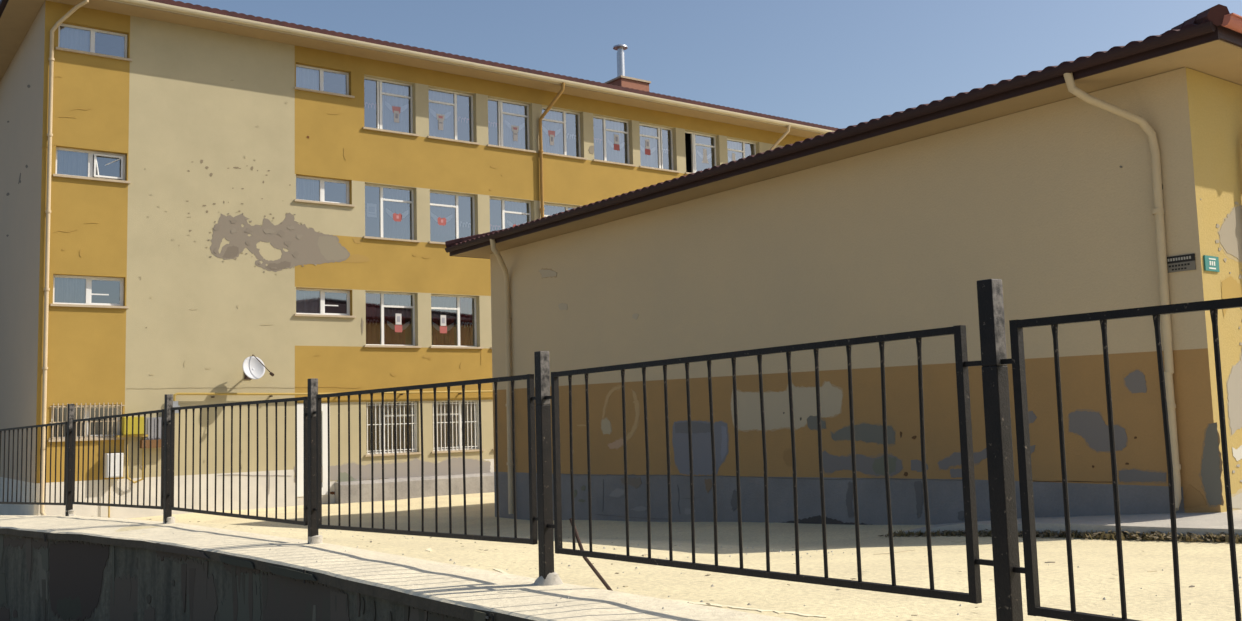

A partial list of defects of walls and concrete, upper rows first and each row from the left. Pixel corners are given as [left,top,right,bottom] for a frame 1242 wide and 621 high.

flaking render [171,188,363,275]
peeling [1215,201,1242,279]
peeling [1227,307,1242,509]